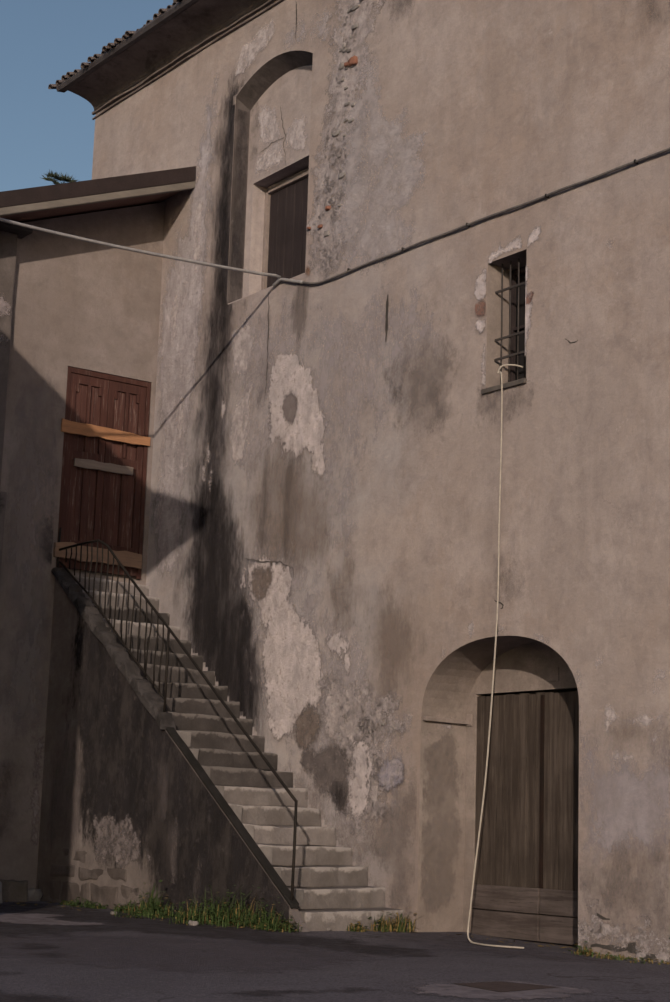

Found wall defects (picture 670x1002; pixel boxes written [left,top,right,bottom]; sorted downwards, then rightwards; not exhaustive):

peeling [235,20,275,76]
peeling [256,107,307,172]
flaking render [306,0,425,281]
flaking render [474,226,542,393]
damp [183,85,262,727]
peeling [267,350,327,478]
peeling [92,814,151,869]
damp [31,613,289,927]
peeling [240,555,411,836]